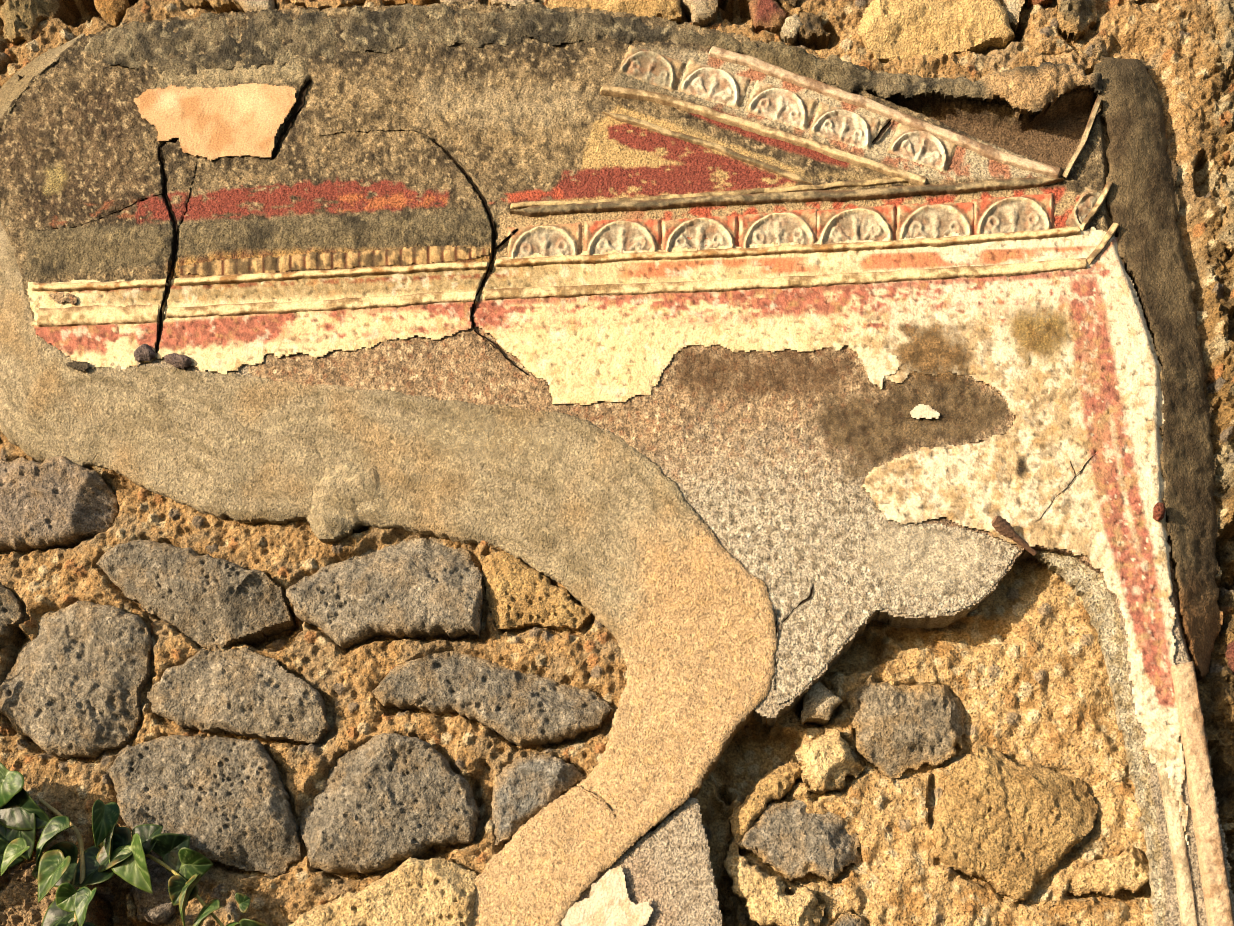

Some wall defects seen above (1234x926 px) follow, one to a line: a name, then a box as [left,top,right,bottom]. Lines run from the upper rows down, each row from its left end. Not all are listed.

crack [38,140,197,353]
crack [272,79,528,375]
leakage [681,352,837,392]
leakage [820,322,1008,476]
leakage [1013,307,1065,356]
spalling [248,327,1166,926]